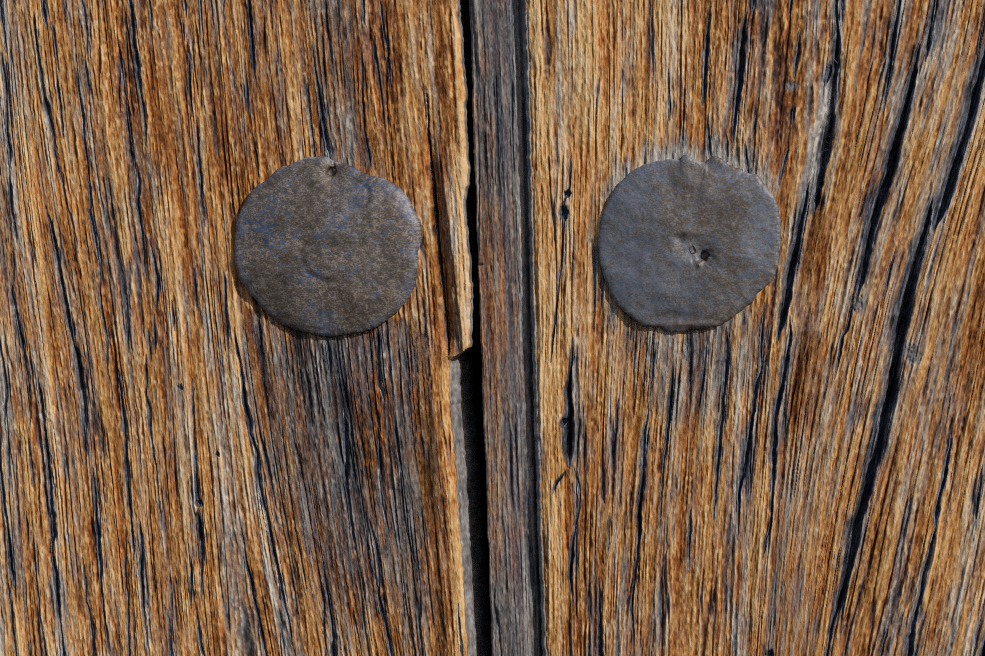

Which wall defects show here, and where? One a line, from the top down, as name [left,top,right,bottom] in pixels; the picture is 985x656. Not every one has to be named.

crack [426,87,450,359]
crack [550,158,581,605]
crack [596,579,604,656]
crack [604,514,612,557]
crack [612,401,620,462]
crack [630,0,843,645]